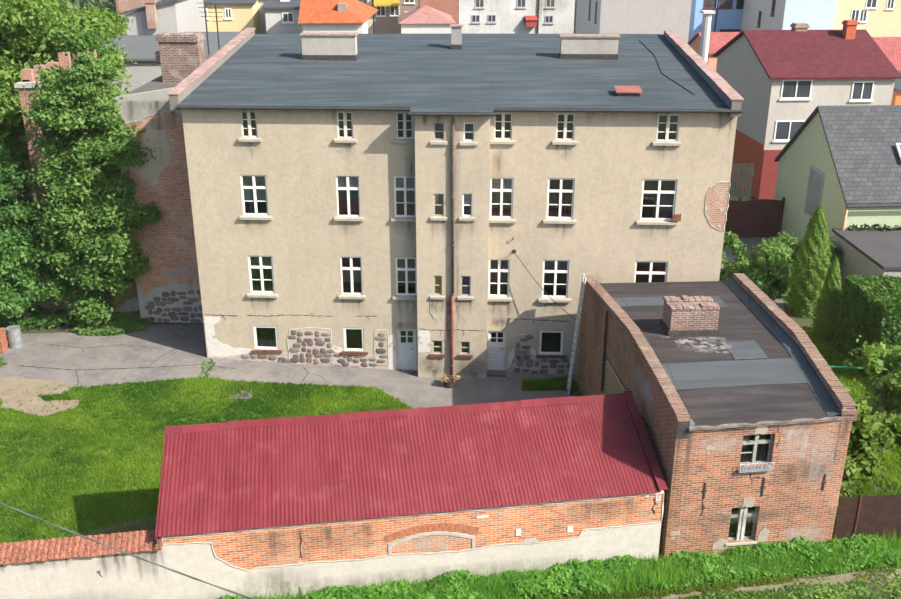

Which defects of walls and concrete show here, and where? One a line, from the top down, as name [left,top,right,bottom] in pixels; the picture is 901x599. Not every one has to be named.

flaking render [114,111,397,370]
flaking render [704,181,730,231]
crack [205,312,334,320]
flaking render [161,492,664,571]